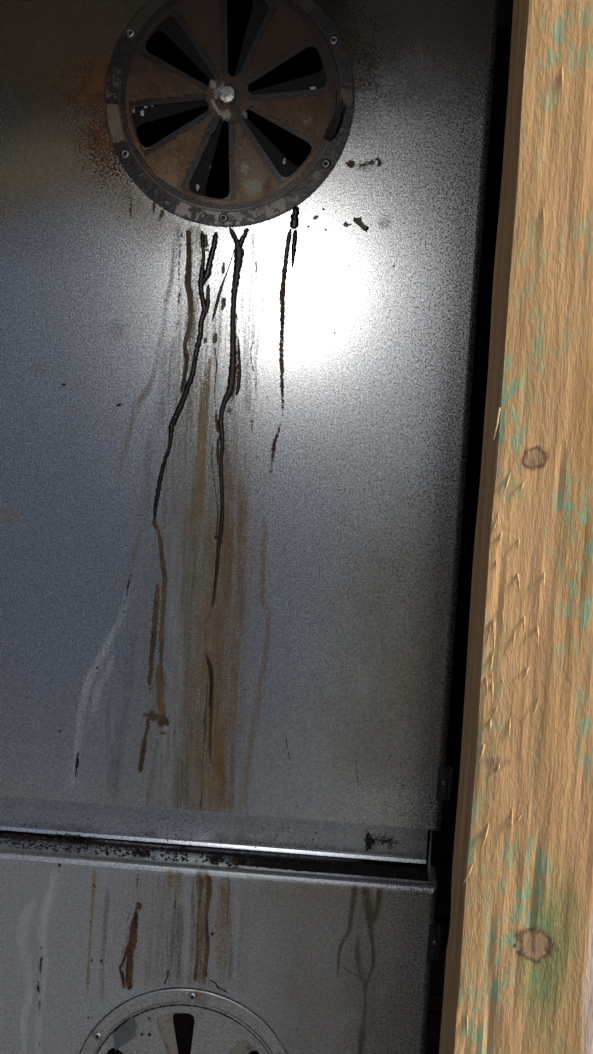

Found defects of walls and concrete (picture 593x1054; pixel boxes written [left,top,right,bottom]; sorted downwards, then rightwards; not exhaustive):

corrosion [40,33,164,221]
corrosion [180,229,201,393]
corrosion [193,359,211,521]
corrosion [137,512,176,772]
corrosion [79,873,277,1054]